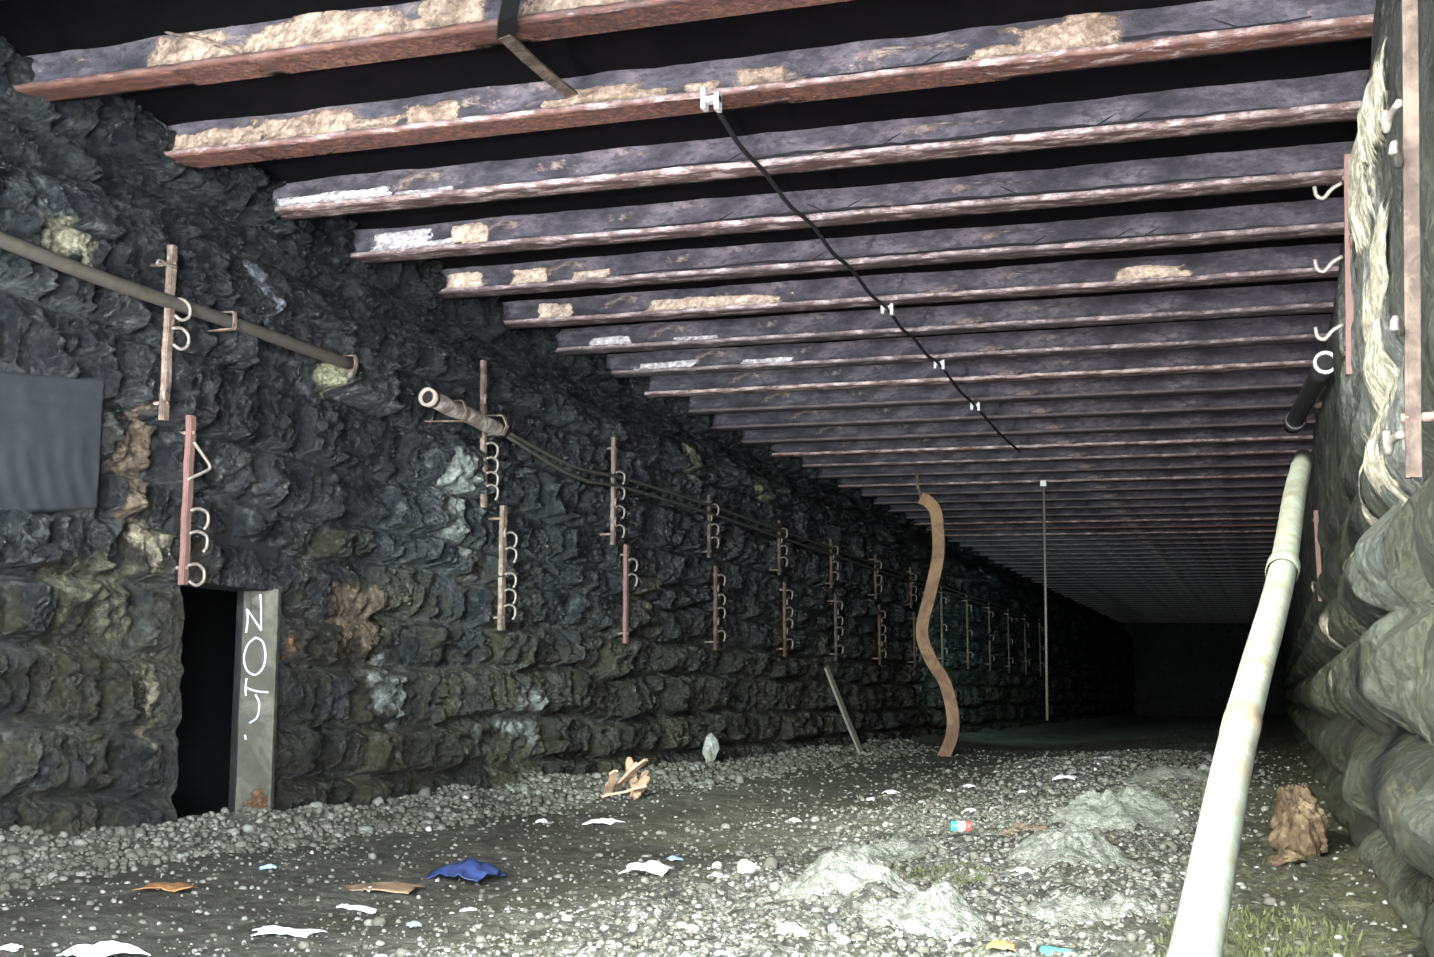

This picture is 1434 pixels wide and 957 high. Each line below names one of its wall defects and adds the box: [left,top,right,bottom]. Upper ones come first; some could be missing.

peeling [147,0,485,67]
spalling [966,12,1122,60]
peeling [172,99,461,151]
peeling [1113,265,1192,281]
damp [1337,39,1424,526]
rust [1219,700,1263,741]